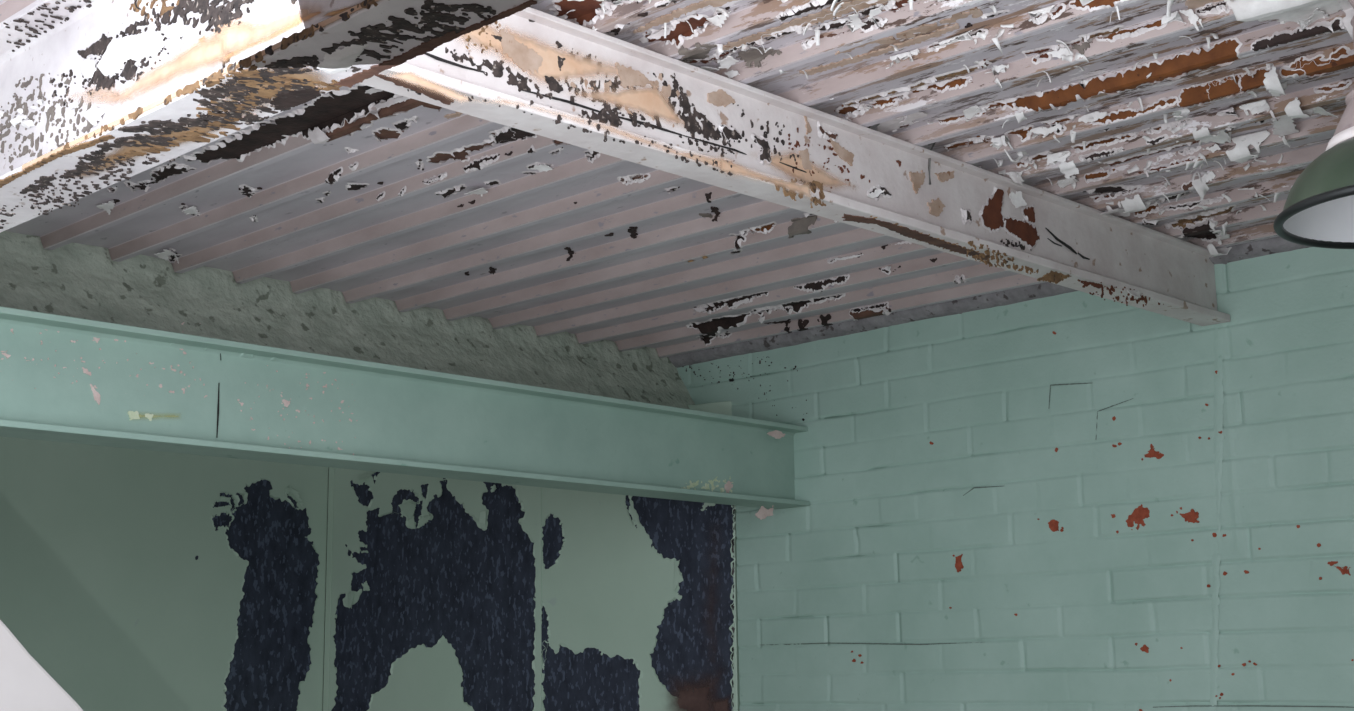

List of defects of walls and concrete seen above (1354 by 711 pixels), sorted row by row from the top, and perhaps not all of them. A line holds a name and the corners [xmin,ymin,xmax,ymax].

peeling [0,0,1354,264]
peeling [686,253,891,346]
peeling [1078,279,1164,307]
peeling [1111,504,1150,534]
peeling [1171,507,1199,523]
peeling [211,478,320,711]
peeling [331,471,737,711]
rust [674,635,734,711]